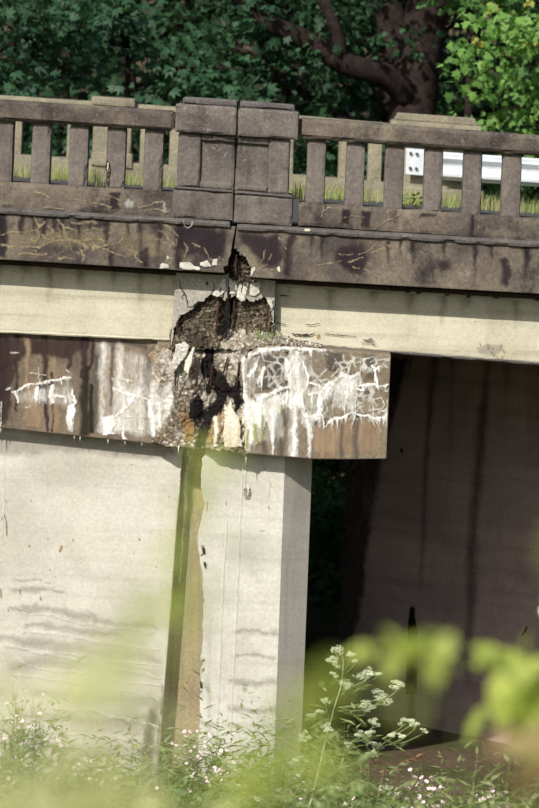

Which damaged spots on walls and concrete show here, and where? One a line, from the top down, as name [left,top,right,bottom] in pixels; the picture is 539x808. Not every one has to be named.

crack [2,192,142,263]
leakage [361,211,371,227]
leakage [241,233,295,275]
leakage [337,244,366,274]
leakage [501,258,511,285]
spalling [148,244,274,454]
leakage [0,335,173,453]
corrosion [208,412,224,445]
leakage [178,346,411,682]